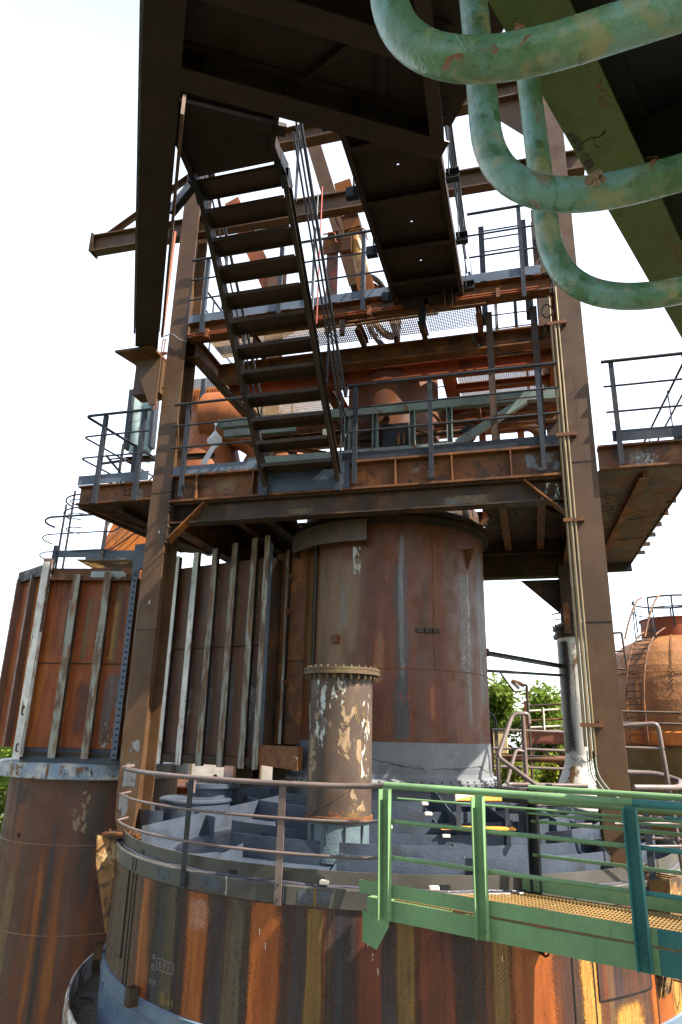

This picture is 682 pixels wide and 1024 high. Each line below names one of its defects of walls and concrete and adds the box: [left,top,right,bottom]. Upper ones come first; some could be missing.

peeling [525,453,560,471]
corrosion [50,595,69,658]
corrosion [79,592,102,660]
corrosion [107,585,128,662]
corrosion [175,575,202,641]
peeling [308,677,370,782]
crack [374,759,488,775]
peeling [73,791,91,833]
corrosion [131,878,158,1000]
corrosion [175,876,227,1023]
corrosion [241,900,291,1024]
corrosion [349,911,391,1024]